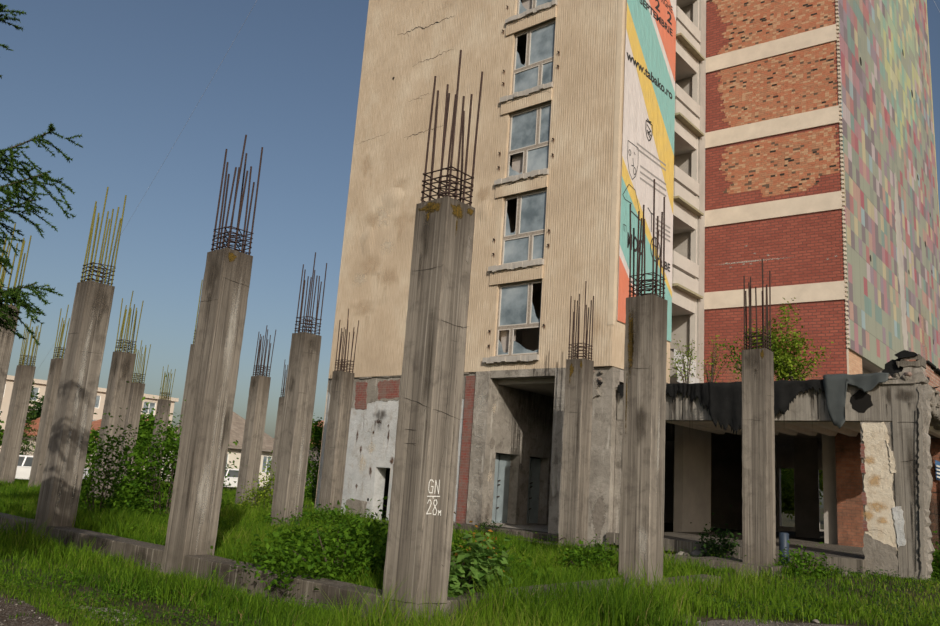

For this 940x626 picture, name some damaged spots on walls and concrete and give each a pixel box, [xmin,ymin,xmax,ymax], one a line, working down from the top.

spalling [710,0,835,55]
spalling [715,42,838,128]
spalling [923,384,940,438]
flaking render [860,422,906,577]